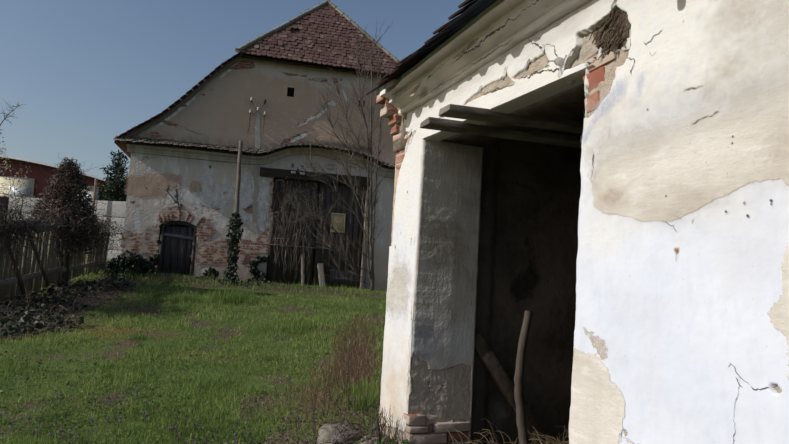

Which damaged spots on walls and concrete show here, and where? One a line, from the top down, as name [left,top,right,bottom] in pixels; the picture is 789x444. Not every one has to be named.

peeling [282,73,347,145]
spalling [465,44,549,105]
spalling [583,38,631,118]
spalling [119,174,274,267]
peeling [767,242,789,379]
peeling [380,324,471,444]
peeling [569,327,630,444]
crack [728,364,769,442]